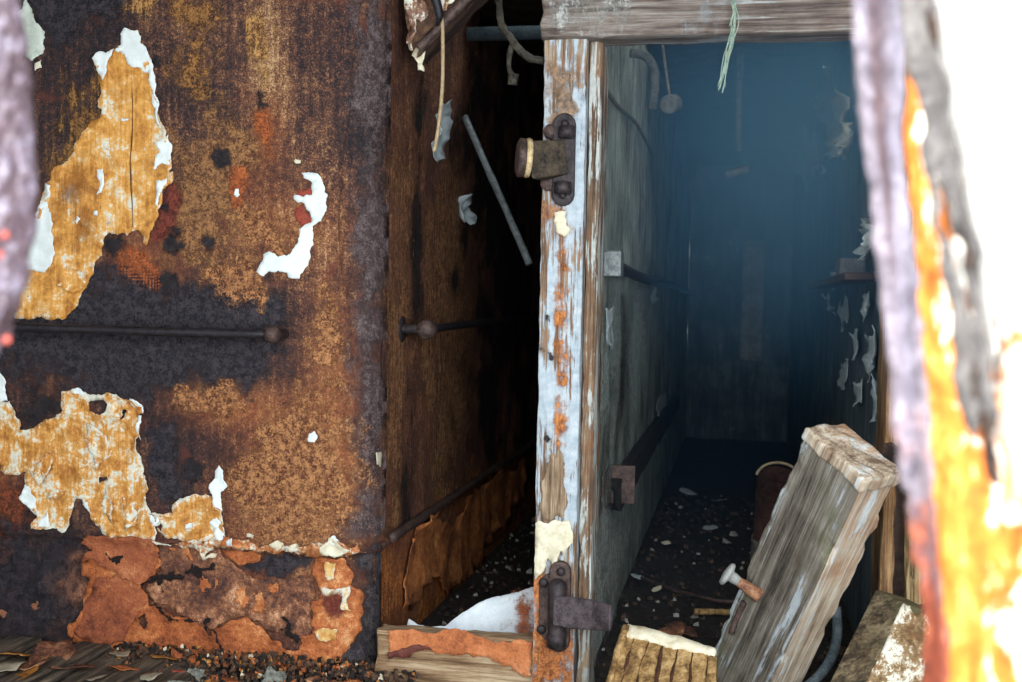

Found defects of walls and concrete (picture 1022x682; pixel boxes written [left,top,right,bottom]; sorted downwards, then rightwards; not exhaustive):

peeling [21,0,45,70]
peeling [15,28,174,320]
rust [116,0,300,314]
peeling [256,159,328,279]
rust [226,112,515,552]
rust [554,234,570,328]
peeling [554,211,571,237]
peeling [0,373,366,558]
rust [173,379,247,437]
peeling [534,439,573,579]
rust [553,339,570,446]
rust [515,563,574,682]